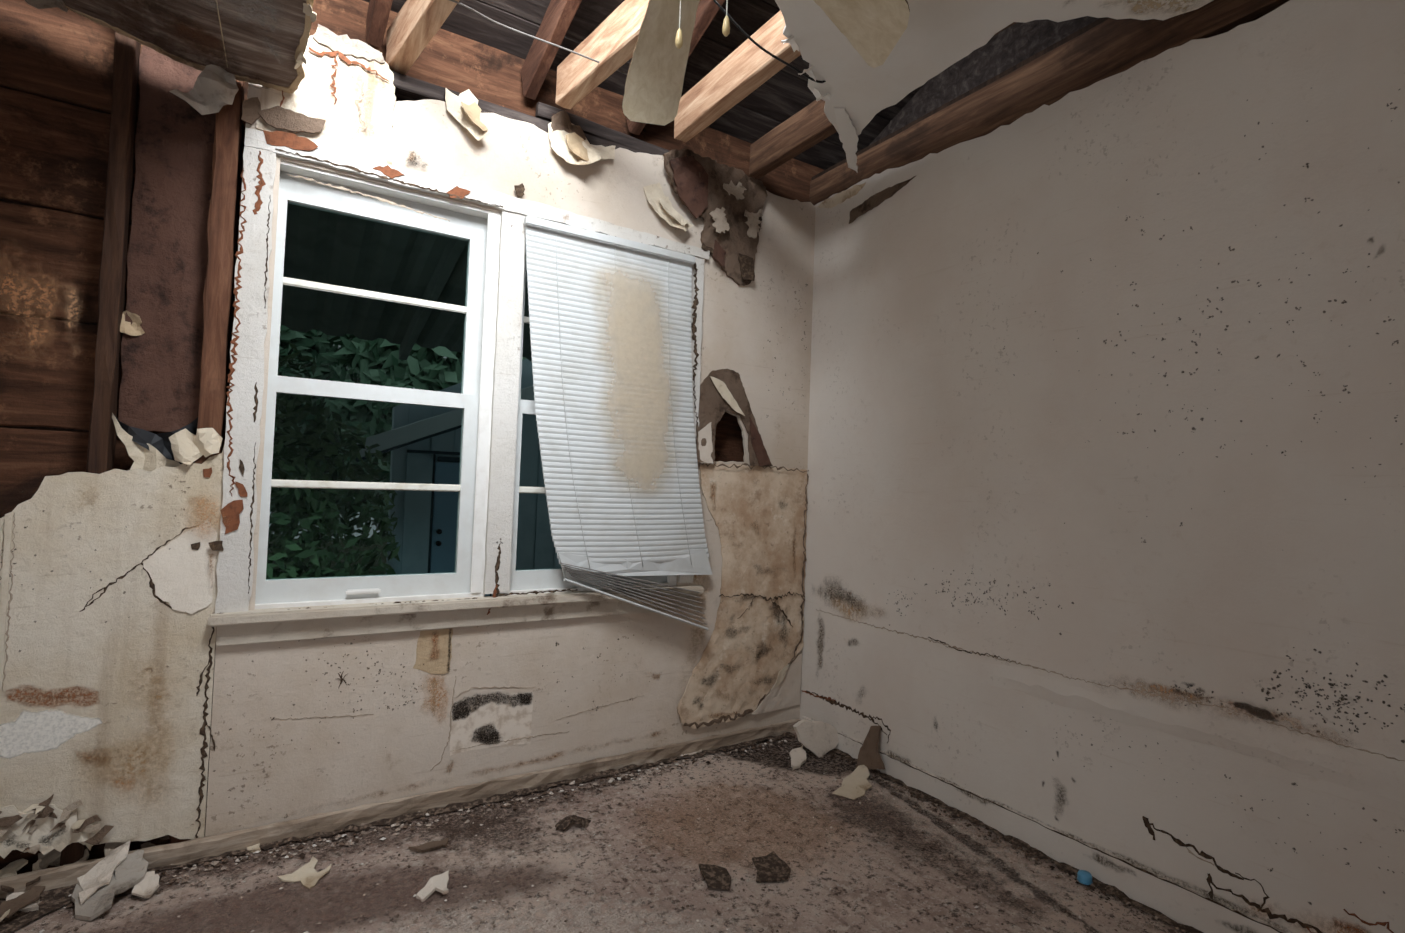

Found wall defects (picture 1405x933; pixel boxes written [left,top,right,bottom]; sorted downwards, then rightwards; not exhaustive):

mould [1103,280,1262,386]
damp [1259,647,1405,741]
spalling [0,794,114,858]
crack [1142,816,1394,933]